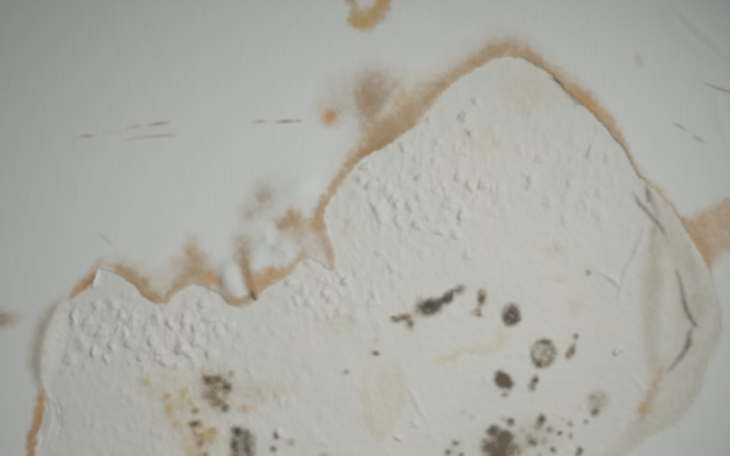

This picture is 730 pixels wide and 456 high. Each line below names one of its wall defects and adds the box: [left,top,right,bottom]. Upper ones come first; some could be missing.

water stain [551,71,623,140]
water stain [315,44,542,232]
water stain [70,271,96,298]
water stain [116,266,199,302]
water stain [226,249,256,305]
water stain [418,290,454,315]
water stain [503,306,521,325]
water stain [205,376,231,391]
water stain [495,371,513,388]
water stain [232,427,249,452]
water stain [484,419,517,456]